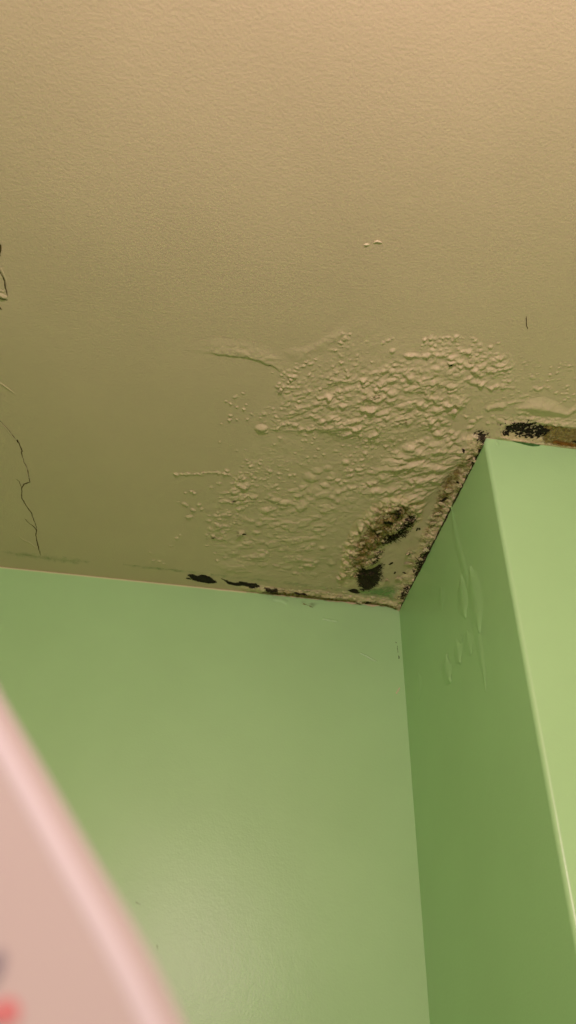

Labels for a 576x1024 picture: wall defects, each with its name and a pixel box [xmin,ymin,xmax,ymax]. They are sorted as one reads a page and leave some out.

crack [0,244,8,310]
crack [0,421,41,555]
water stain [186,430,490,610]
water stain [500,419,576,447]